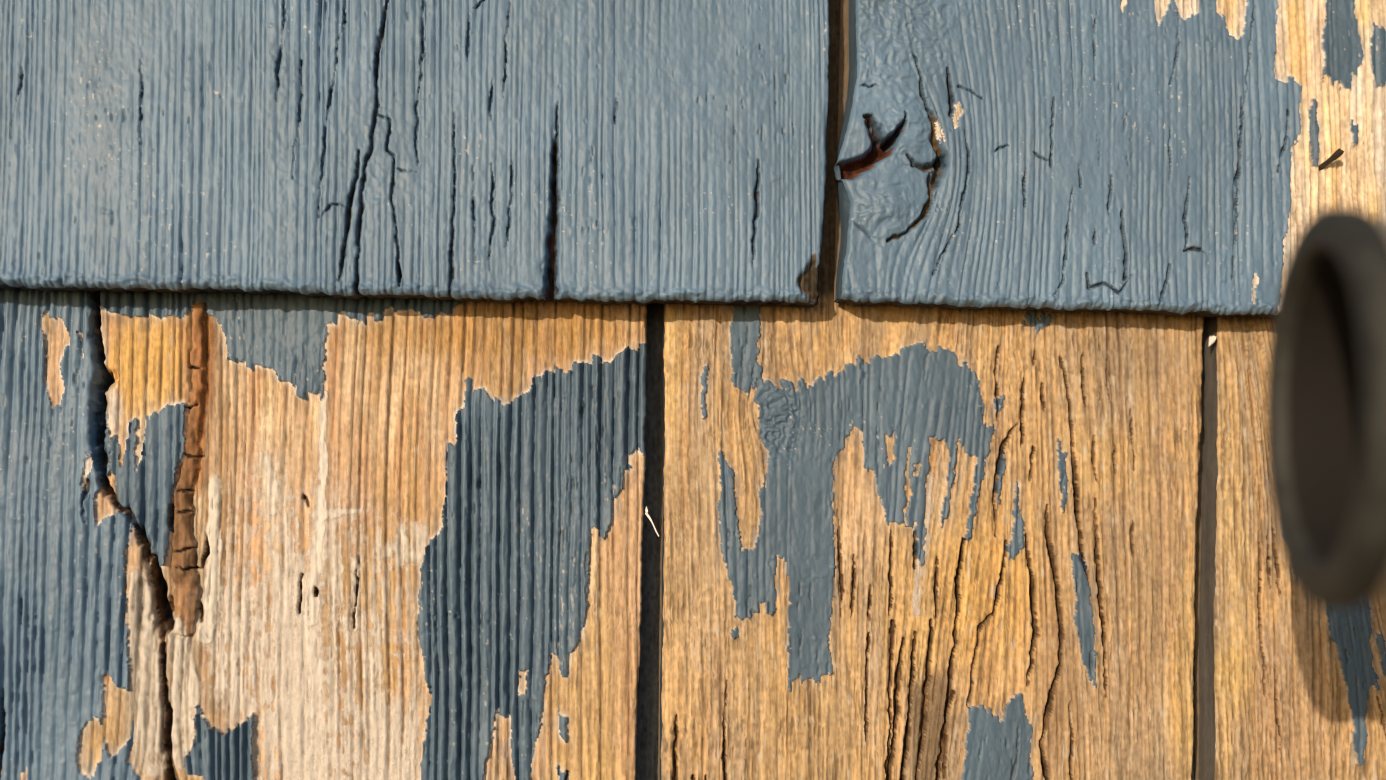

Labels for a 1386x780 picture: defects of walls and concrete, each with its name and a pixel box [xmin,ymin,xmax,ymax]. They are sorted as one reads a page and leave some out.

crack [275,0,425,295]
crack [448,124,514,297]
crack [544,105,560,301]
crack [862,55,1128,296]
peeling [1154,0,1247,39]
peeling [1274,0,1386,283]
peeling [41,311,84,407]
crack [80,291,210,780]
peeling [77,291,662,780]
peeling [661,0,1204,780]
crack [837,346,1135,780]
peeling [1208,316,1386,780]